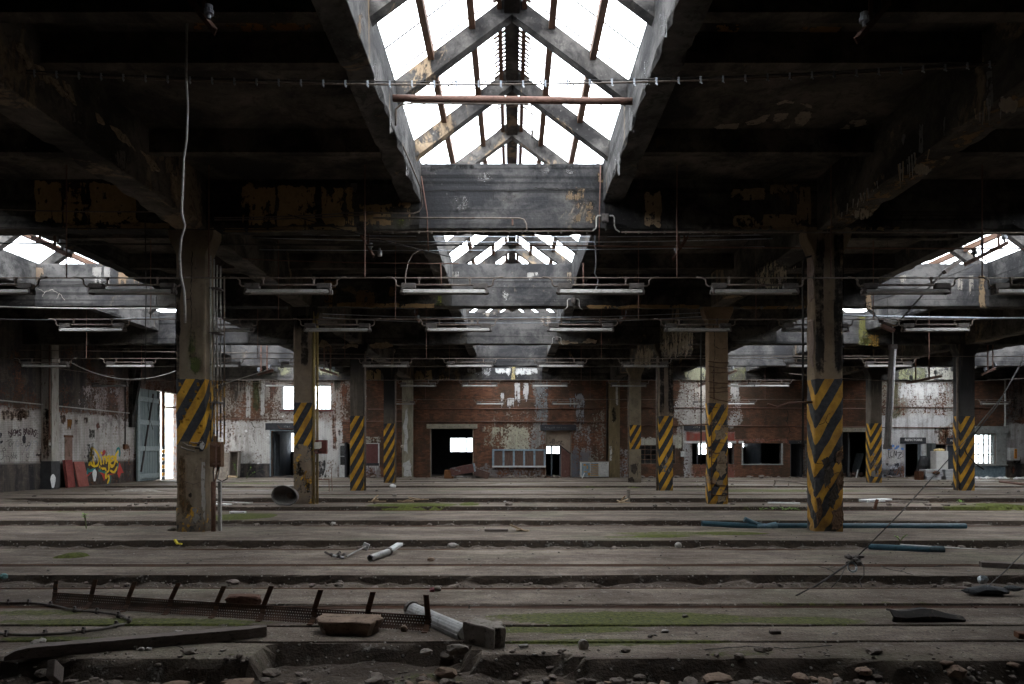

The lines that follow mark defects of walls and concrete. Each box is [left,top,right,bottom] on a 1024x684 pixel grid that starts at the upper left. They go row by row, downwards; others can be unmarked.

peeling [714,100,812,129]
peeling [241,182,411,227]
peeling [565,187,601,223]
peeling [644,191,662,228]
leakage [815,230,844,373]
spalling [816,446,844,530]